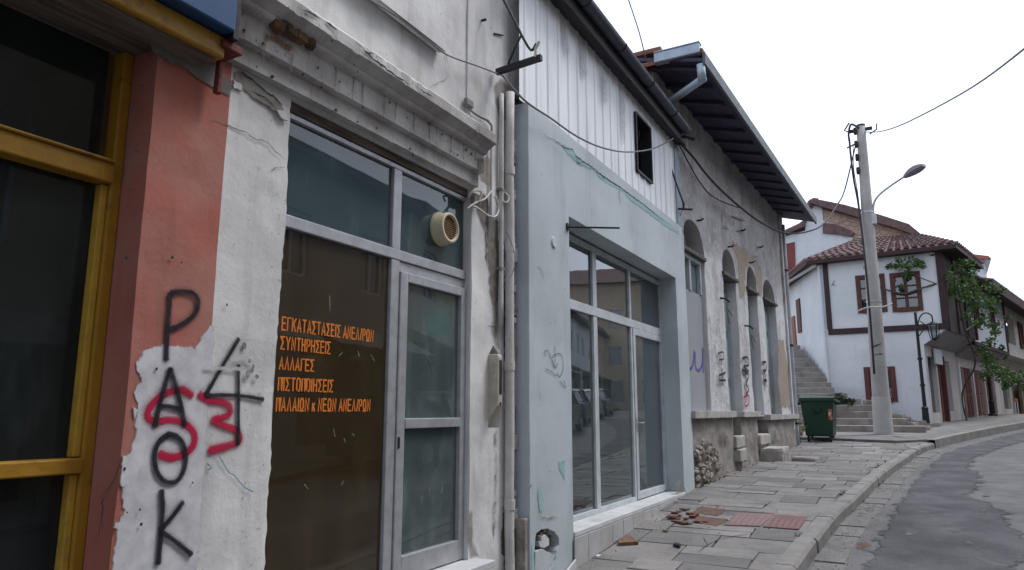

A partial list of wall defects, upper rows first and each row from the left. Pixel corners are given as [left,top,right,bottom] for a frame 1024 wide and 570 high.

flaking render [232,72,288,121]
crack [211,119,285,171]
crack [543,132,664,221]
peeling [112,325,215,570]
spalling [532,529,555,570]